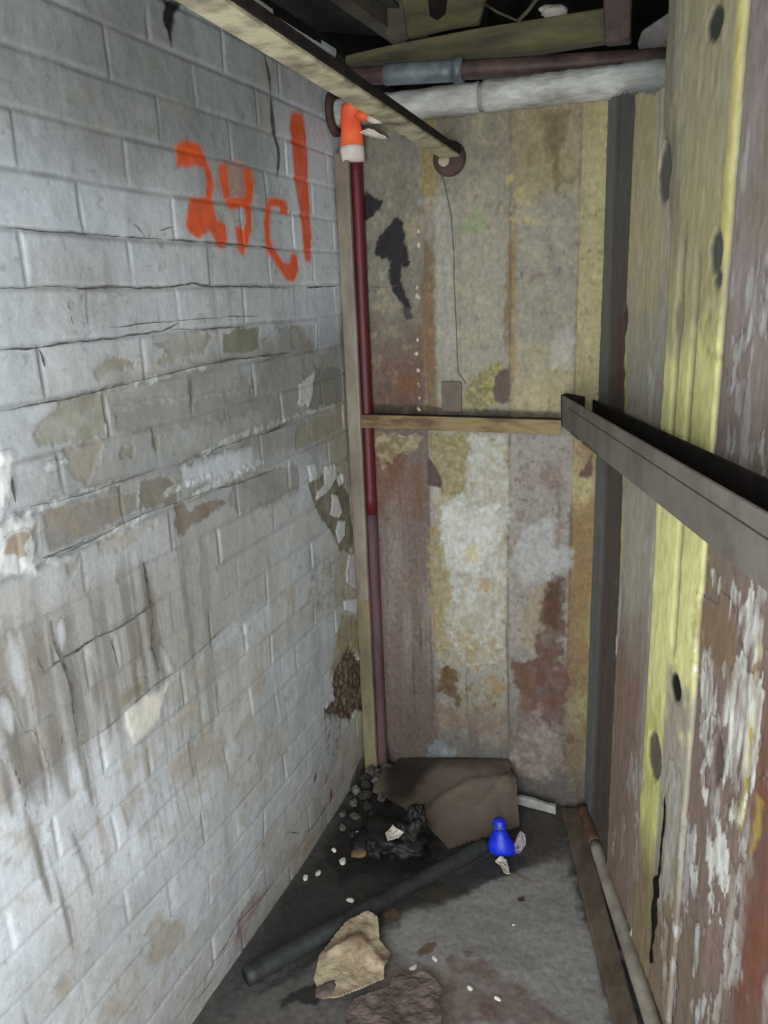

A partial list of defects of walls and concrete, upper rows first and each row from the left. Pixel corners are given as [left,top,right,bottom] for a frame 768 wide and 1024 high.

crack [0,282,274,367]
peeling [32,353,138,486]
peeling [0,458,357,622]
corrosion [375,455,437,539]
water stain [0,613,113,953]
crack [37,563,230,745]
water stain [118,561,174,750]
water stain [165,731,231,790]
spalling [320,651,362,769]
corrosion [423,566,577,745]
peeling [657,552,768,1024]
crack [649,796,666,964]